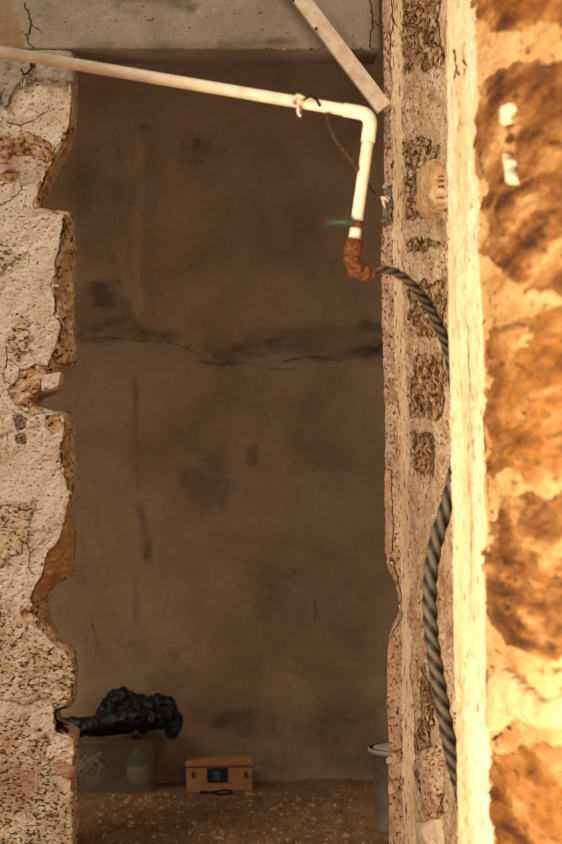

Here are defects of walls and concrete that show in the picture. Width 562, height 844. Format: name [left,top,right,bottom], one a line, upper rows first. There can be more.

crack [24,2,42,48]
peeling [0,58,79,108]
spalling [0,128,76,208]
spalling [0,215,79,503]
crack [82,331,382,371]
spalling [0,497,36,567]
spalling [0,517,79,844]